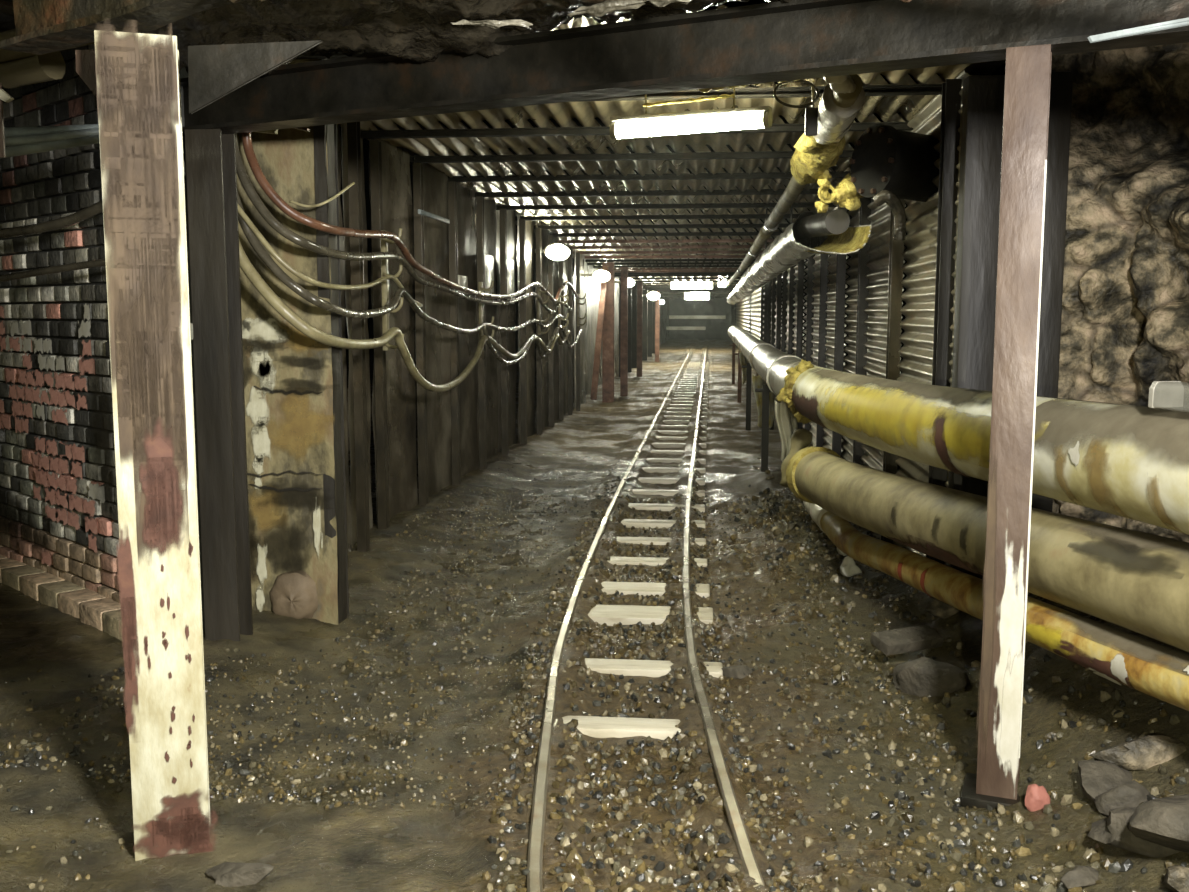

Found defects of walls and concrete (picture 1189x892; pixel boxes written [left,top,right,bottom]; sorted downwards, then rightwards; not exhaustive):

corrosion [95,24,193,733]
peeling [993,543,1024,783]
corrosion [1052,640,1136,690]
corrosion [133,777,218,858]